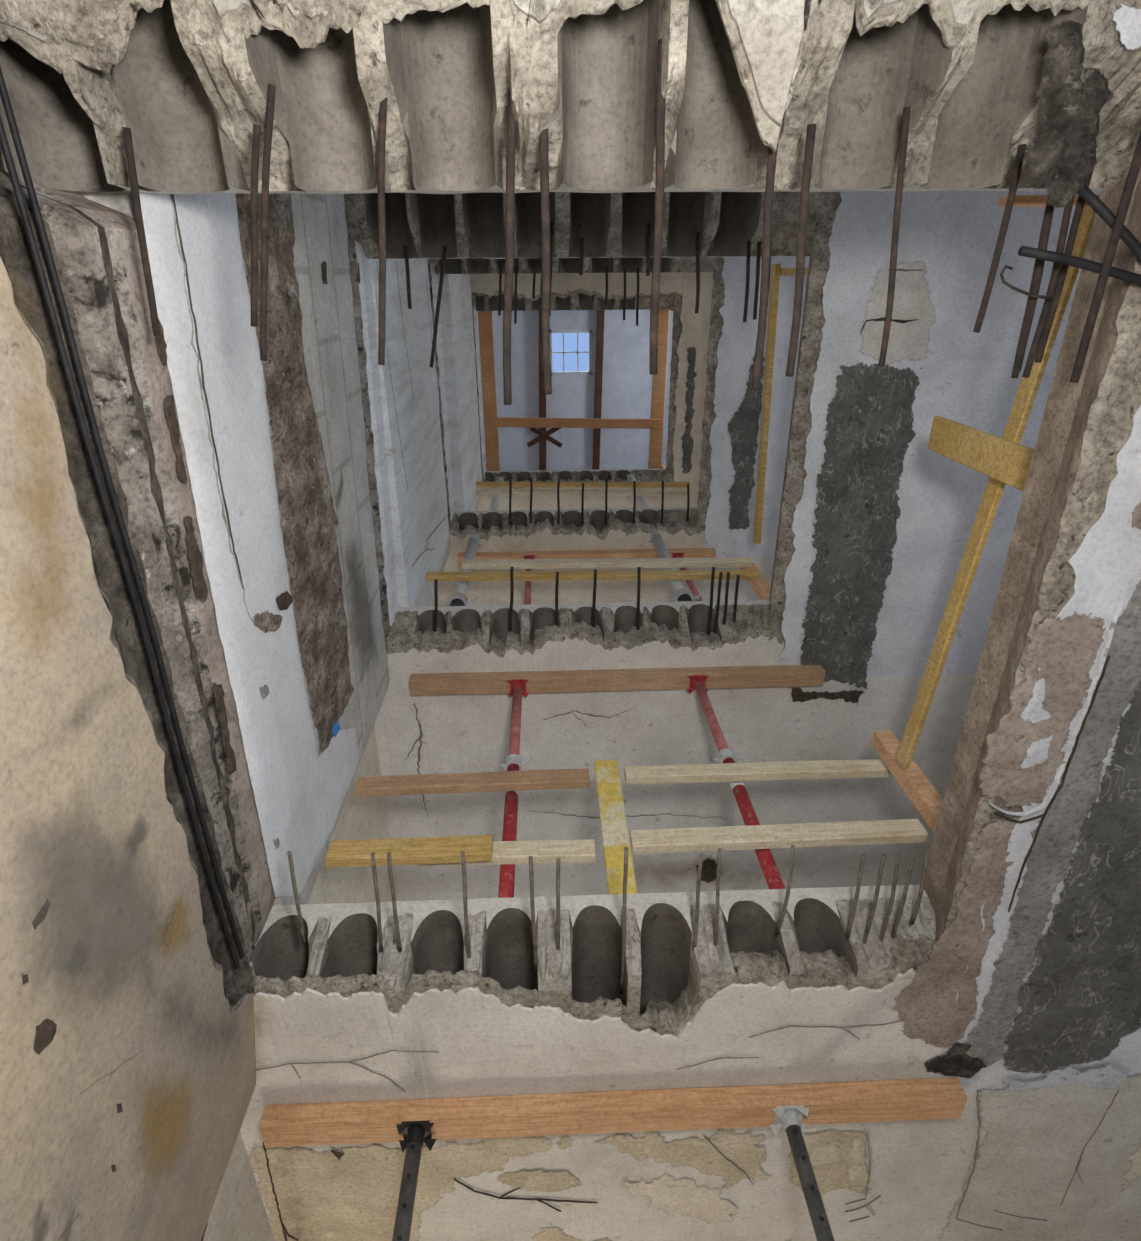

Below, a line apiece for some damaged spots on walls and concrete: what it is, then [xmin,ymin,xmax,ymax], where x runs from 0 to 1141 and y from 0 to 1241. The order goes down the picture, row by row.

spalling [1022,20,1113,208]
peeling [1113,4,1141,50]
crack [169,194,265,627]
flaking render [728,355,765,530]
flaking render [790,262,936,703]
crack [995,655,1111,913]
flaking render [892,580,1141,1241]
crack [256,1050,439,1092]
crack [676,1020,901,1070]
peeling [249,1144,406,1241]
crack [454,1178,598,1212]
crack [956,1089,1119,1230]